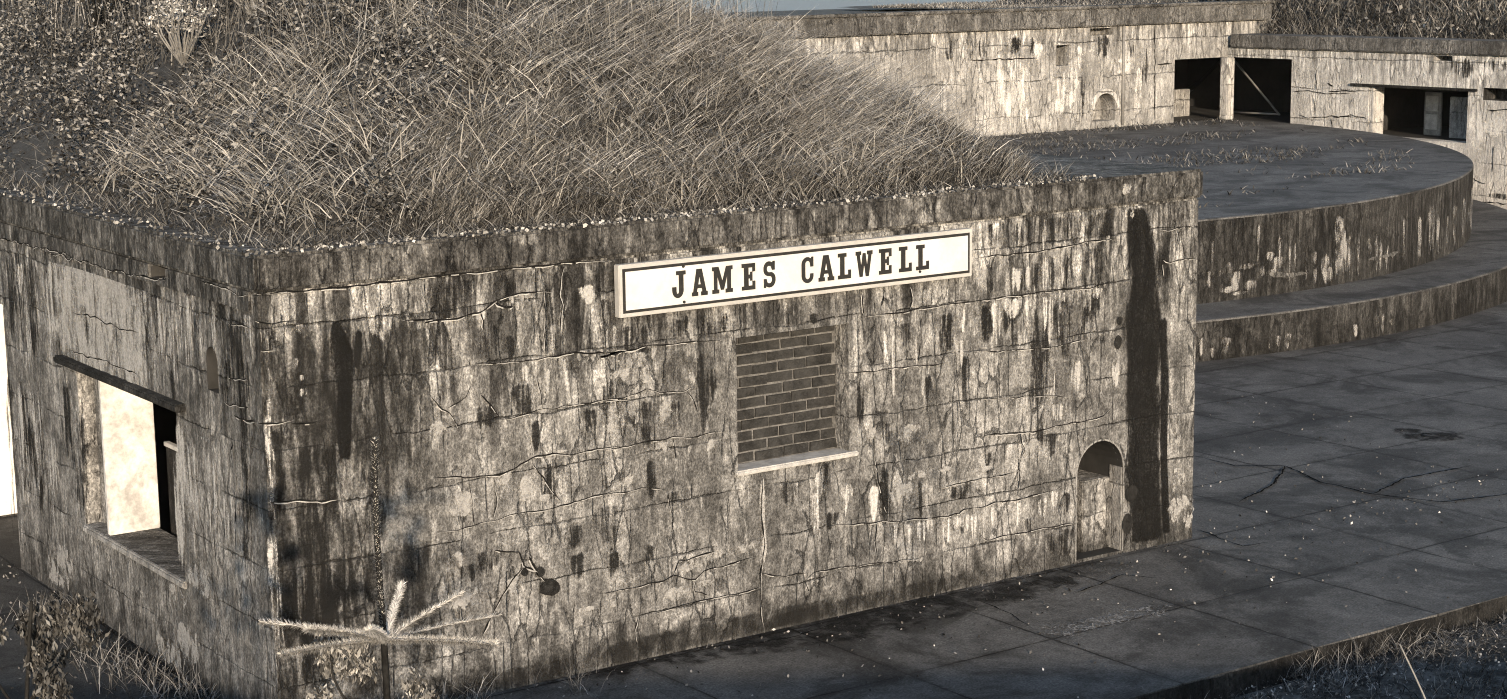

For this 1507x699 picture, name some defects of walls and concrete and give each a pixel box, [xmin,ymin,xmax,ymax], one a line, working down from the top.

leakage [1267,219,1388,282]
leakage [4,254,457,699]
leakage [507,326,566,499]
leakage [569,507,619,578]
leakage [579,285,648,366]
leakage [623,402,682,507]
leakage [671,352,717,430]
leakage [813,463,994,544]
leakage [883,318,931,411]
leakage [939,212,1109,458]
leakage [1112,208,1170,543]
leakage [593,570,1077,677]